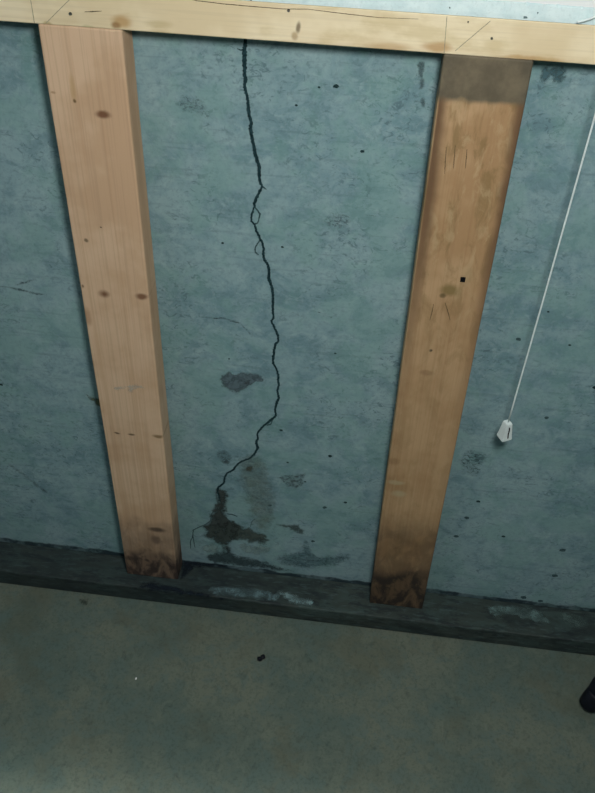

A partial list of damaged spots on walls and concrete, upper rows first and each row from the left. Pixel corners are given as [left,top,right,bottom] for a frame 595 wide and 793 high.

crack [190,39,280,548]
leakage [181,489,344,577]
leakage [142,582,313,605]